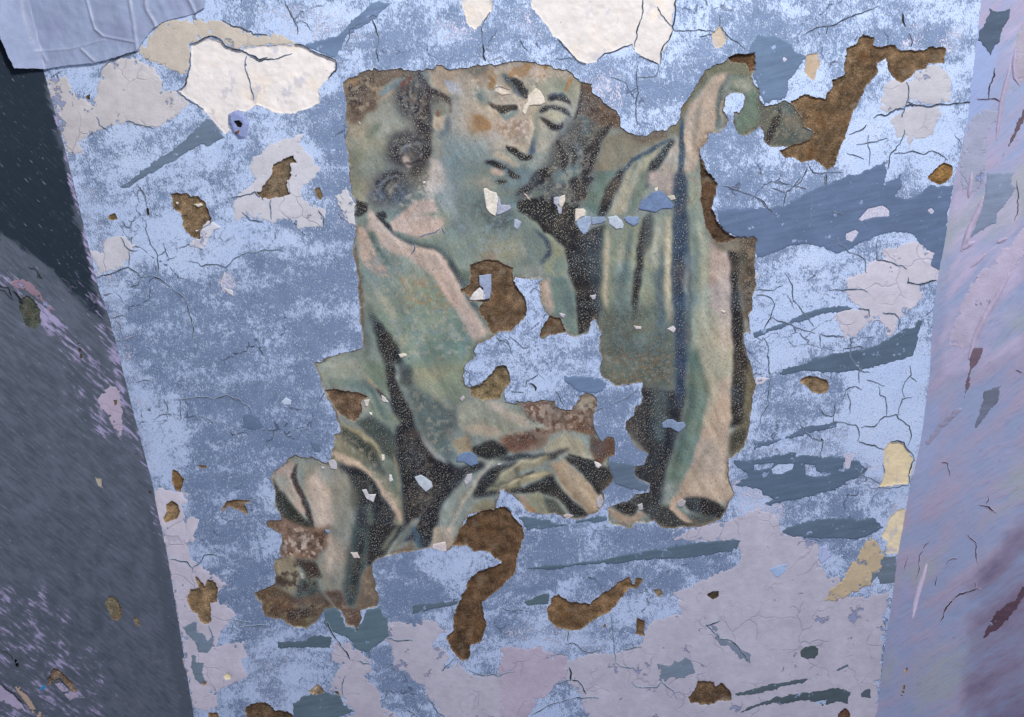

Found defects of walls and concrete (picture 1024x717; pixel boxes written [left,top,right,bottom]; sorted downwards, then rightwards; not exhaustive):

peeling [47,19,336,156]
spalling [779,34,952,170]
crack [28,184,283,342]
spalling [171,192,221,250]
peeling [233,134,356,229]
spalling [460,259,527,334]
crack [723,68,1000,329]
crack [756,273,917,492]
peeling [882,508,906,555]
peeling [879,441,913,487]
peeling [384,493,890,717]